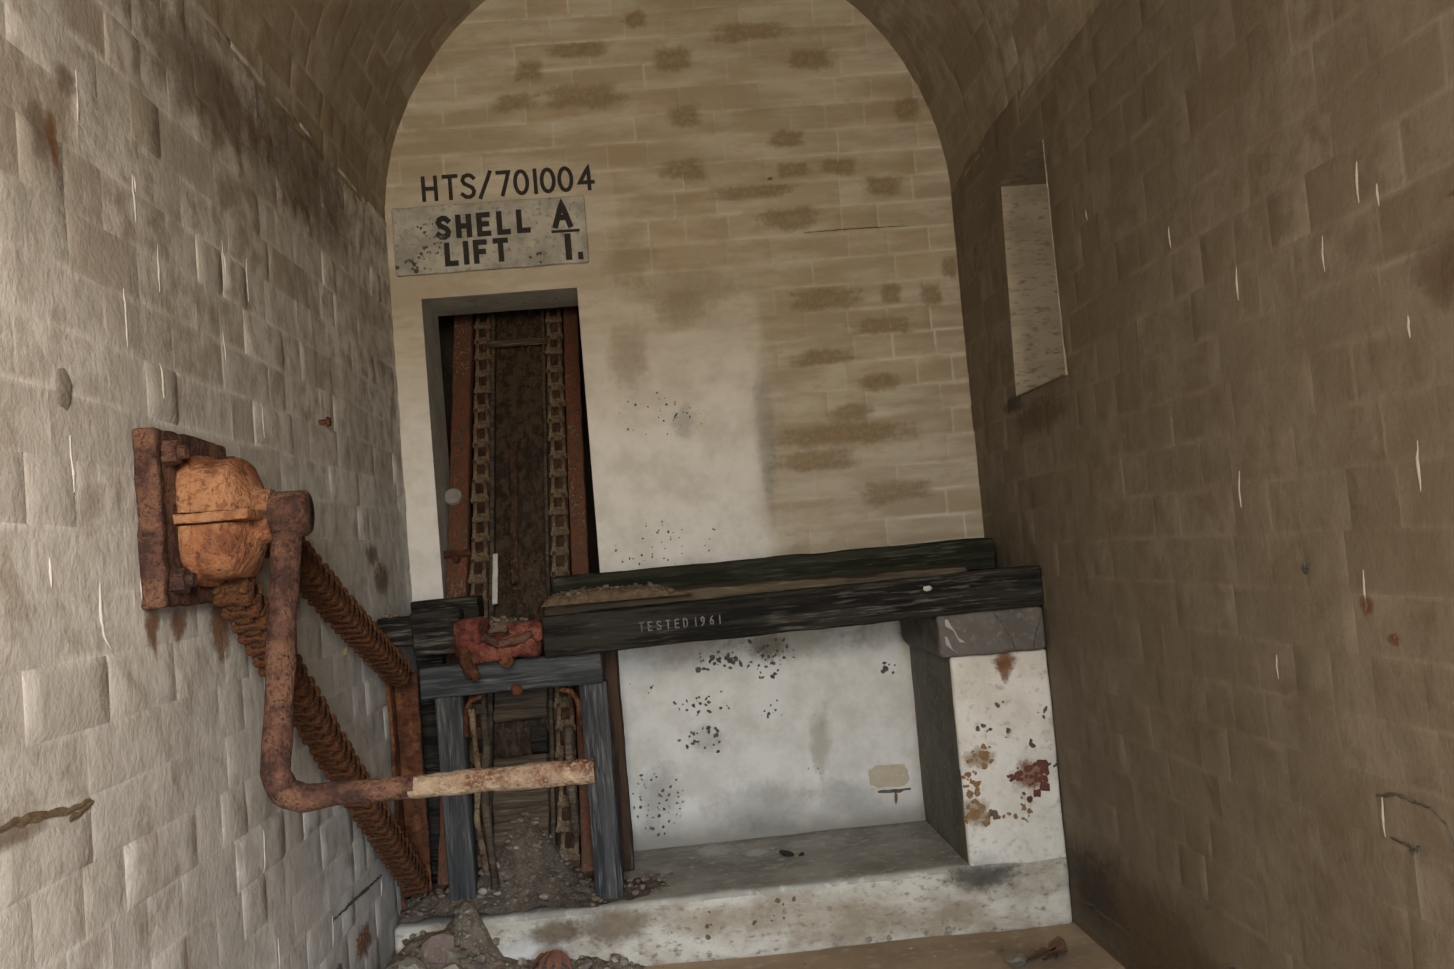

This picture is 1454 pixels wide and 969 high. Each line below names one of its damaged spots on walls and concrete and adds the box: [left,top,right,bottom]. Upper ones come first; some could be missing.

corrosion [145,610,186,651]
corrosion [210,604,230,661]
corrosion [996,651,1015,681]
crack [1375,792,1454,855]